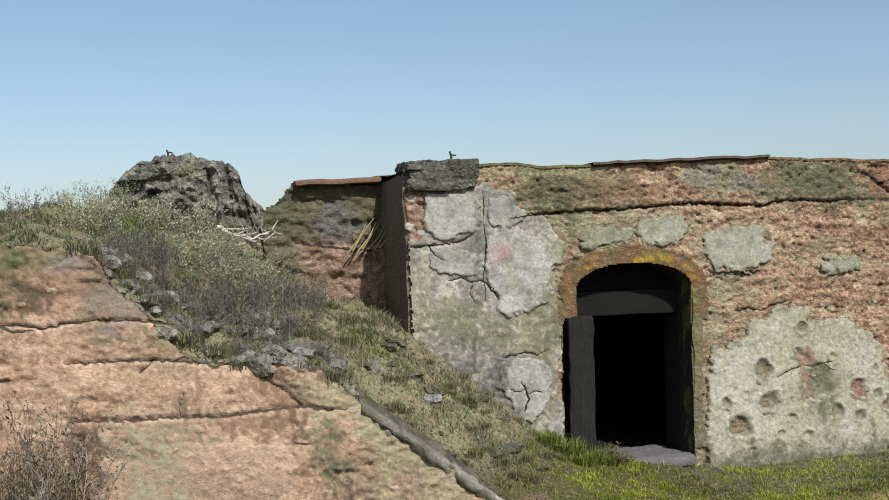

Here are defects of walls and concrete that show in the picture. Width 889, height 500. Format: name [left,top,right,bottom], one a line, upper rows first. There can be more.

crack [850,171,889,193]
crack [511,198,843,219]
crack [295,242,379,252]
crack [410,186,500,304]
crack [706,268,761,276]
crack [0,318,181,333]
crack [503,350,545,358]
crack [65,356,249,374]
crack [777,360,836,378]
crack [74,363,348,423]
crack [511,382,542,412]
flaking render [702,301,889,467]